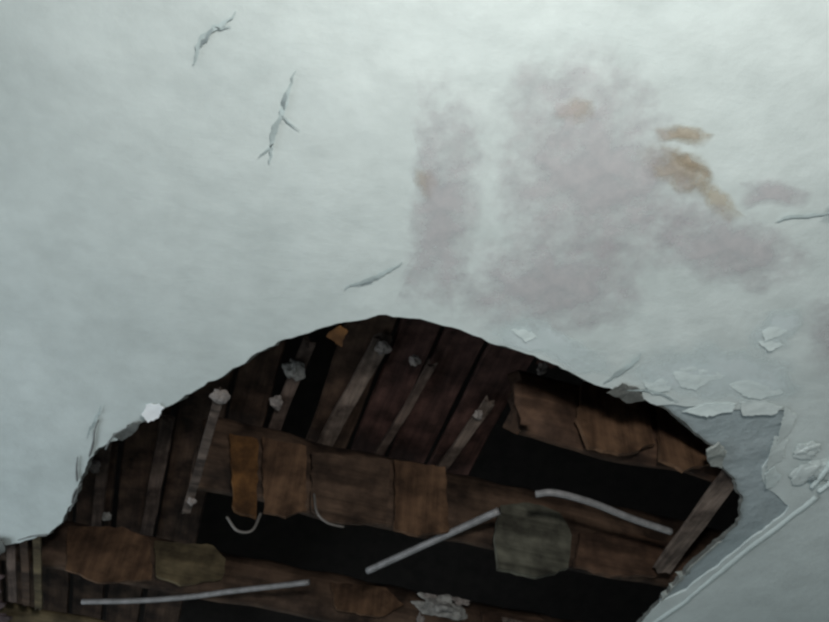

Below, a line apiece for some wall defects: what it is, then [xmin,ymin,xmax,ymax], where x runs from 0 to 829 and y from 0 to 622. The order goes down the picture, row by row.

crack [193,11,236,65]
crack [259,71,300,164]
corrosion [663,128,700,140]
corrosion [653,153,709,189]
spalling [310,318,369,347]
spalling [18,335,300,541]
flaking render [466,324,797,622]